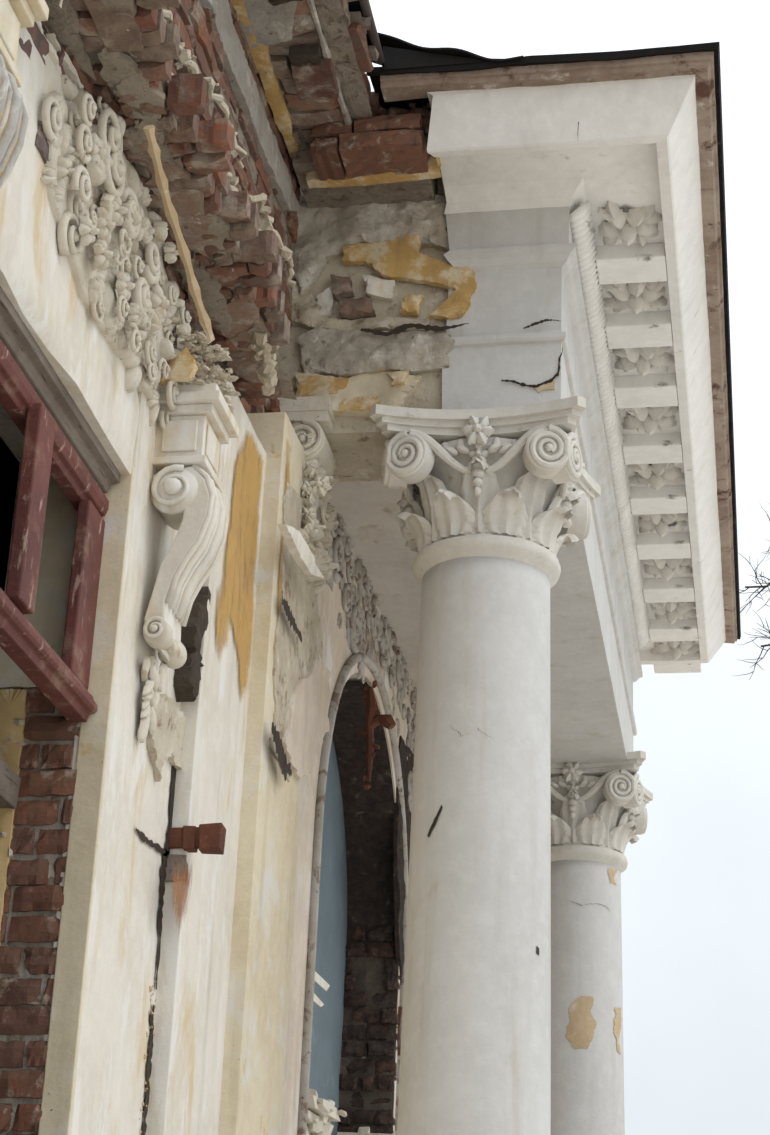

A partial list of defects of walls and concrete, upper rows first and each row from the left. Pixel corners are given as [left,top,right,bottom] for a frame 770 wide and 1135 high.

spalling [19,0,477,416]
crack [501,319,563,393]
spalling [282,482,315,547]
spalling [142,586,211,782]
spalling [0,688,80,1135]
spalling [269,540,414,1134]
peeling [566,996,597,1049]
peeling [614,1008,622,1054]